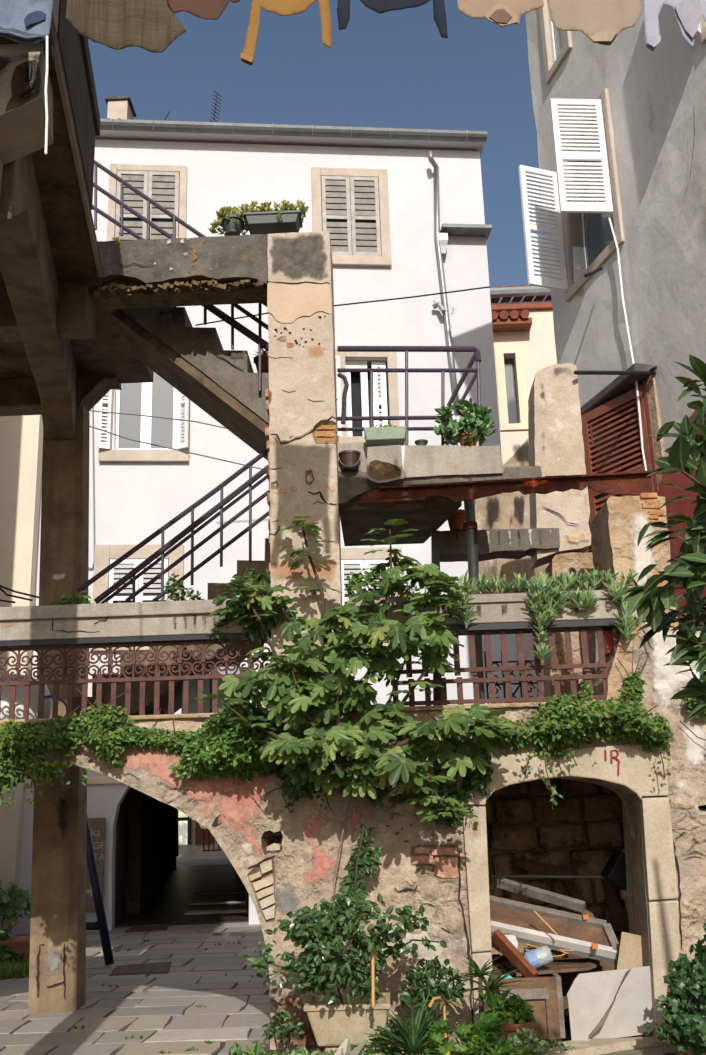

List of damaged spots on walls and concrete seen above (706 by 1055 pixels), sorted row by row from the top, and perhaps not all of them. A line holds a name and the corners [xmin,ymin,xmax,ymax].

flaking render [93,279,331,348]
crack [271,390,336,470]
water stain [513,442,529,460]
water stain [487,496,541,545]
peeling [303,814,338,884]
flaking render [386,817,459,879]
flaking render [400,911,455,1009]